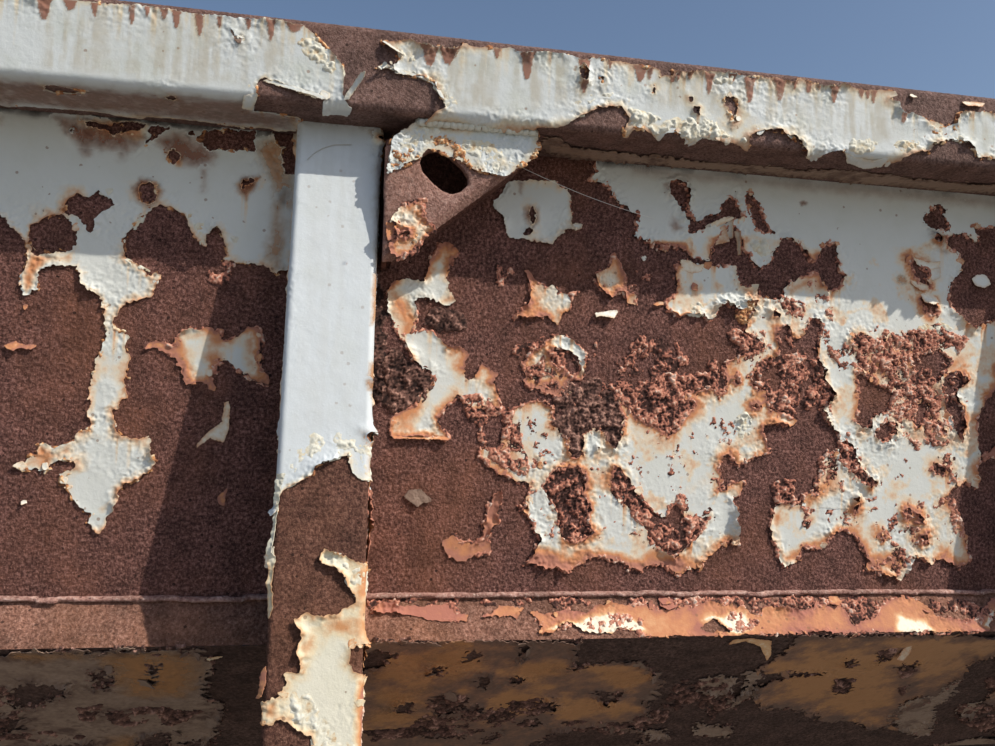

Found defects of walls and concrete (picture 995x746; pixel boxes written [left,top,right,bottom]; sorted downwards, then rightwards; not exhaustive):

peeling [0,0,671,746]
peeling [374,39,995,581]
rust [113,655,192,694]
peeling [530,594,995,739]